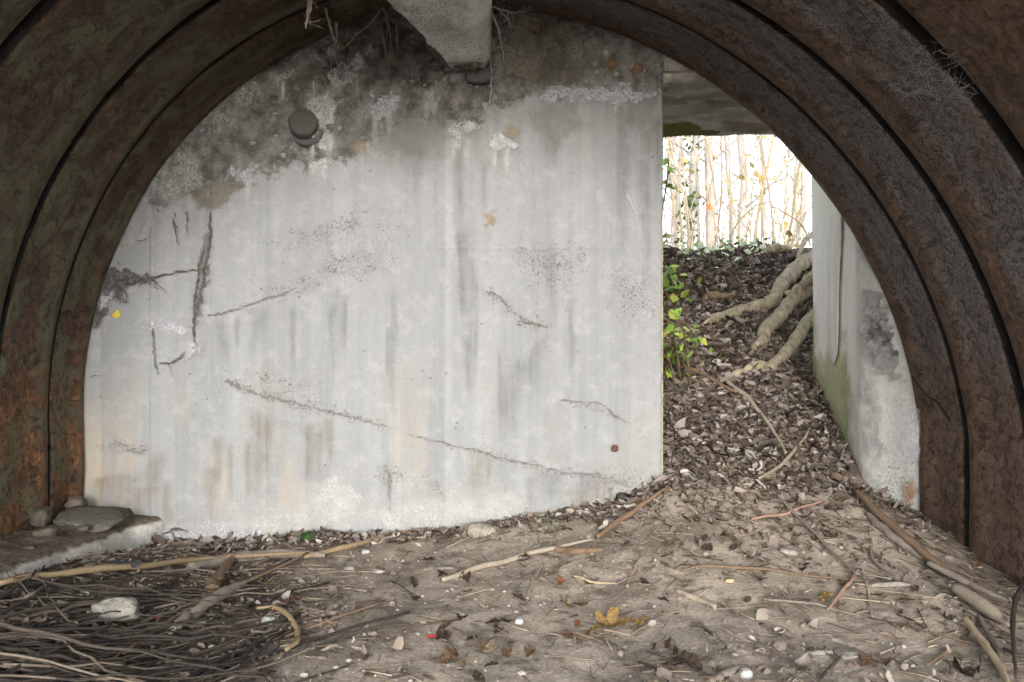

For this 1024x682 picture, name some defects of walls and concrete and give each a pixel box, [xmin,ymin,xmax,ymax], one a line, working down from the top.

leakage [266,43,371,171]
efflorescence [368,91,405,121]
efflorescence [448,119,480,150]
efflorescence [489,132,517,160]
leakage [188,161,259,208]
crack [123,210,295,375]
crack [486,291,548,328]
crack [224,378,631,487]